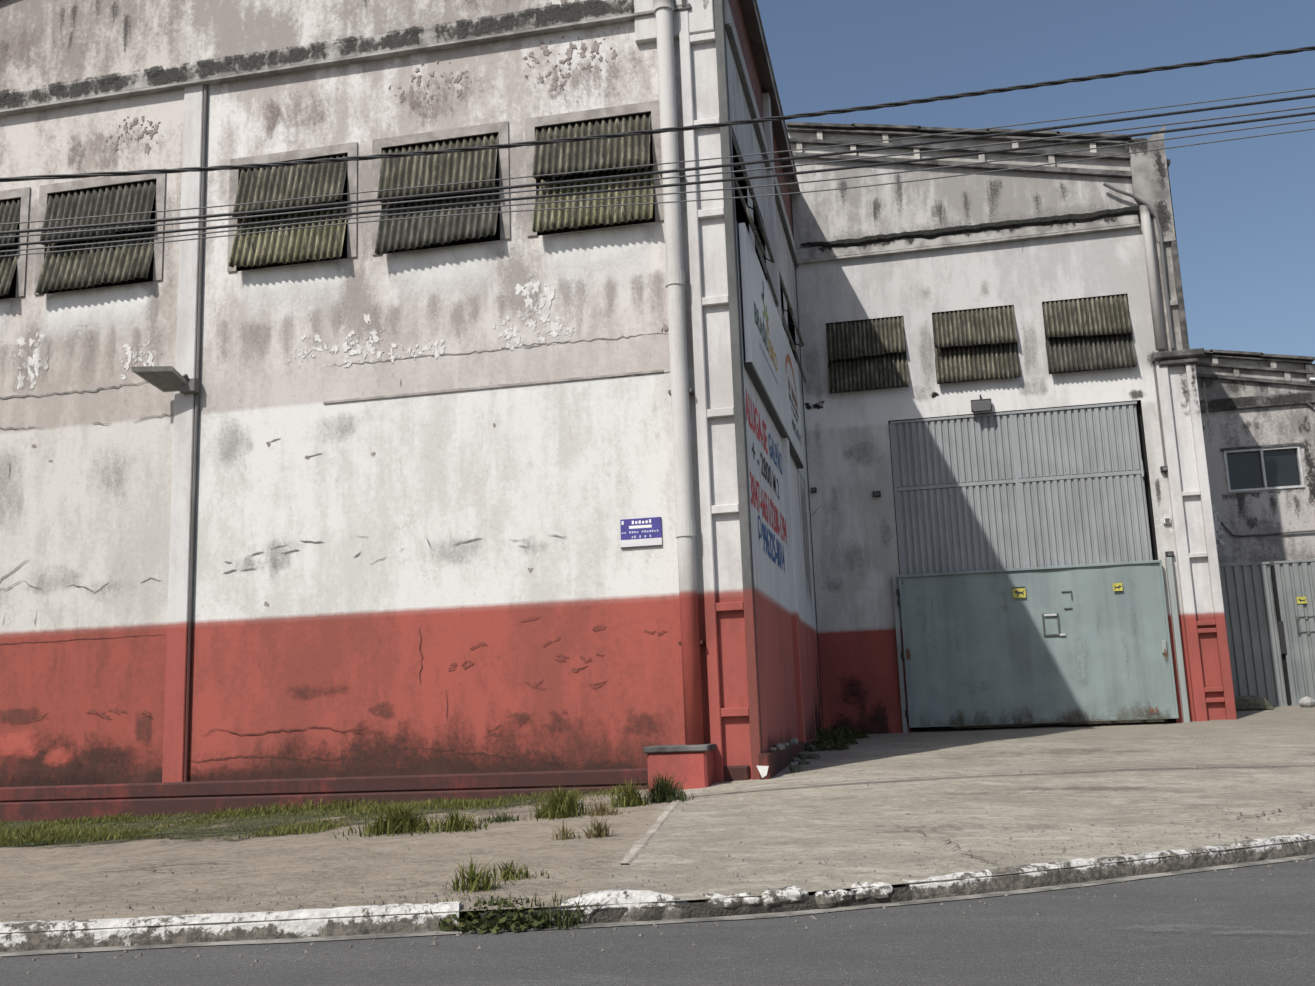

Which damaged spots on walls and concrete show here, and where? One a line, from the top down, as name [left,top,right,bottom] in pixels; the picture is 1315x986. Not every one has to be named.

damp [0,0,633,108]
peeling [14,332,49,390]
peeling [120,341,162,380]
peeling [287,313,446,368]
peeling [492,274,574,352]
crack [0,560,165,645]
damp [1,709,36,724]
damp [806,670,889,739]
damp [1,748,162,787]
damp [188,737,647,782]